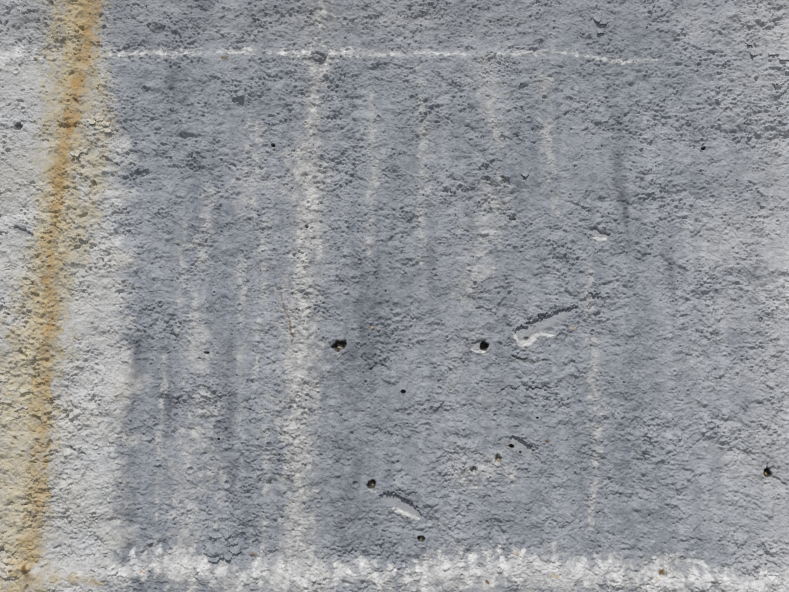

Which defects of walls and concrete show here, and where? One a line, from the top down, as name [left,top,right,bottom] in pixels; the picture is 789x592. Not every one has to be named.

rust [0,0,100,592]